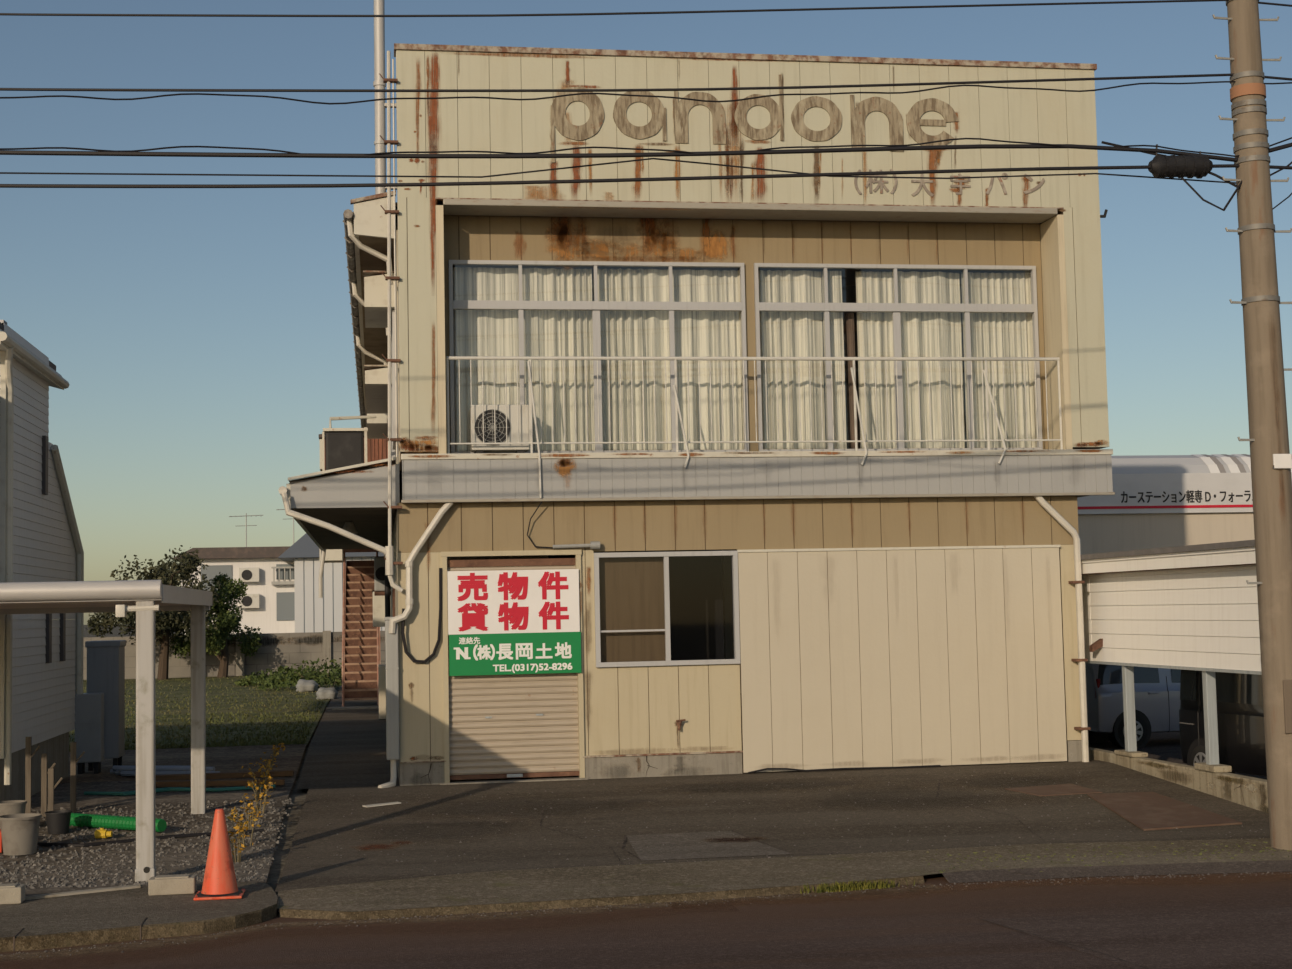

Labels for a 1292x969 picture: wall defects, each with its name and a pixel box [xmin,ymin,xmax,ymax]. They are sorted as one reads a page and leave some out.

corrosion [470,53,596,89]
corrosion [693,58,772,196]
corrosion [399,55,440,277]
corrosion [528,162,557,199]
corrosion [546,142,734,262]
corrosion [928,150,965,205]
corrosion [400,436,448,458]
corrosion [549,454,588,476]